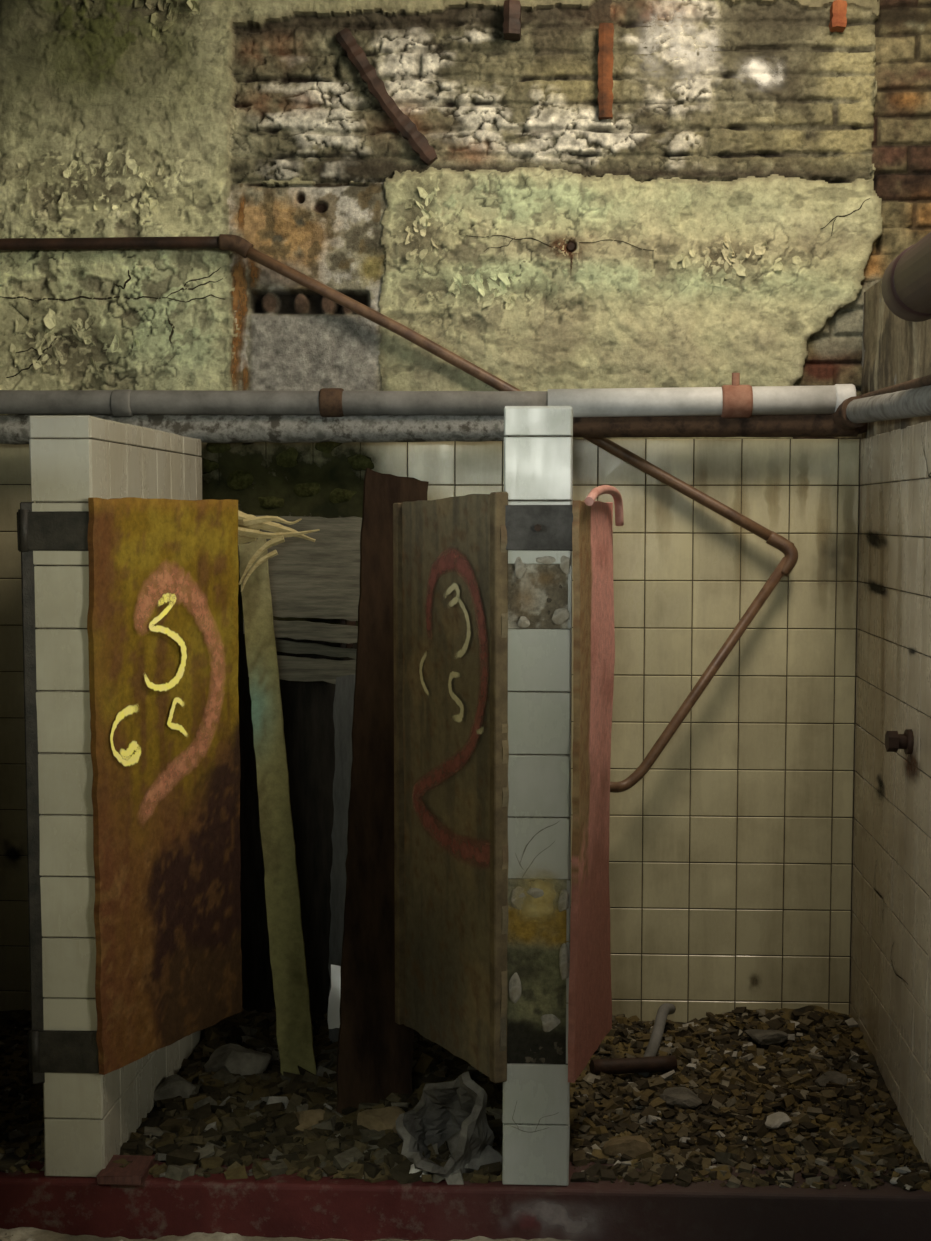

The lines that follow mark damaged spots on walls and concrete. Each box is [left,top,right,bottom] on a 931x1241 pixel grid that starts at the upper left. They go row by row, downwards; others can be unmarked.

rust [231,257,259,391]
spalling [228,0,931,396]